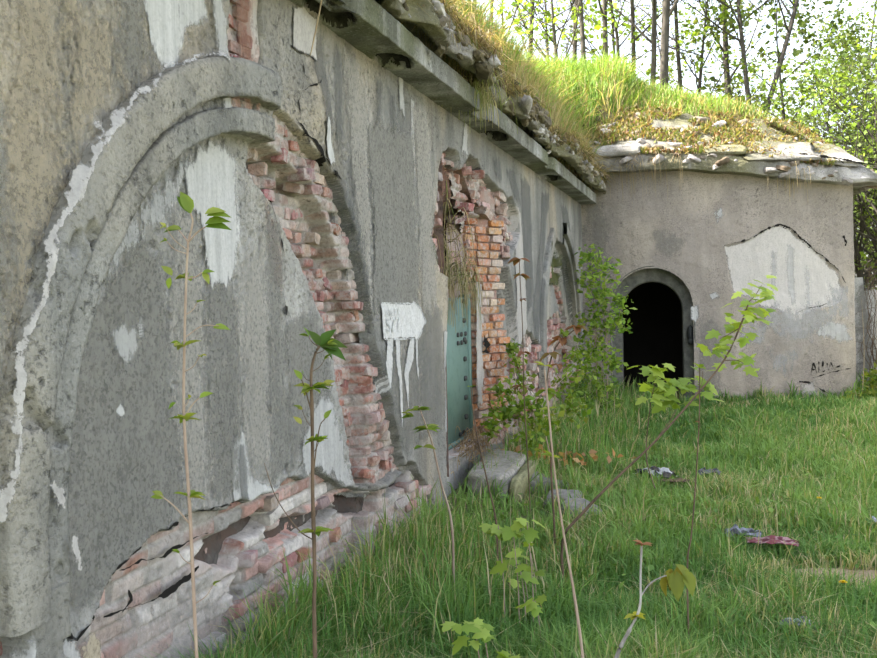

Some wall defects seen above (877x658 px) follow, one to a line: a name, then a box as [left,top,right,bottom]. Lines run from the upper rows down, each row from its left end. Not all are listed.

flaking render [227,0,260,63]
flaking render [432,153,513,271]
flaking render [725,225,842,324]
crack [724,224,846,283]
flaking render [63,114,432,658]
flaking render [498,267,580,450]